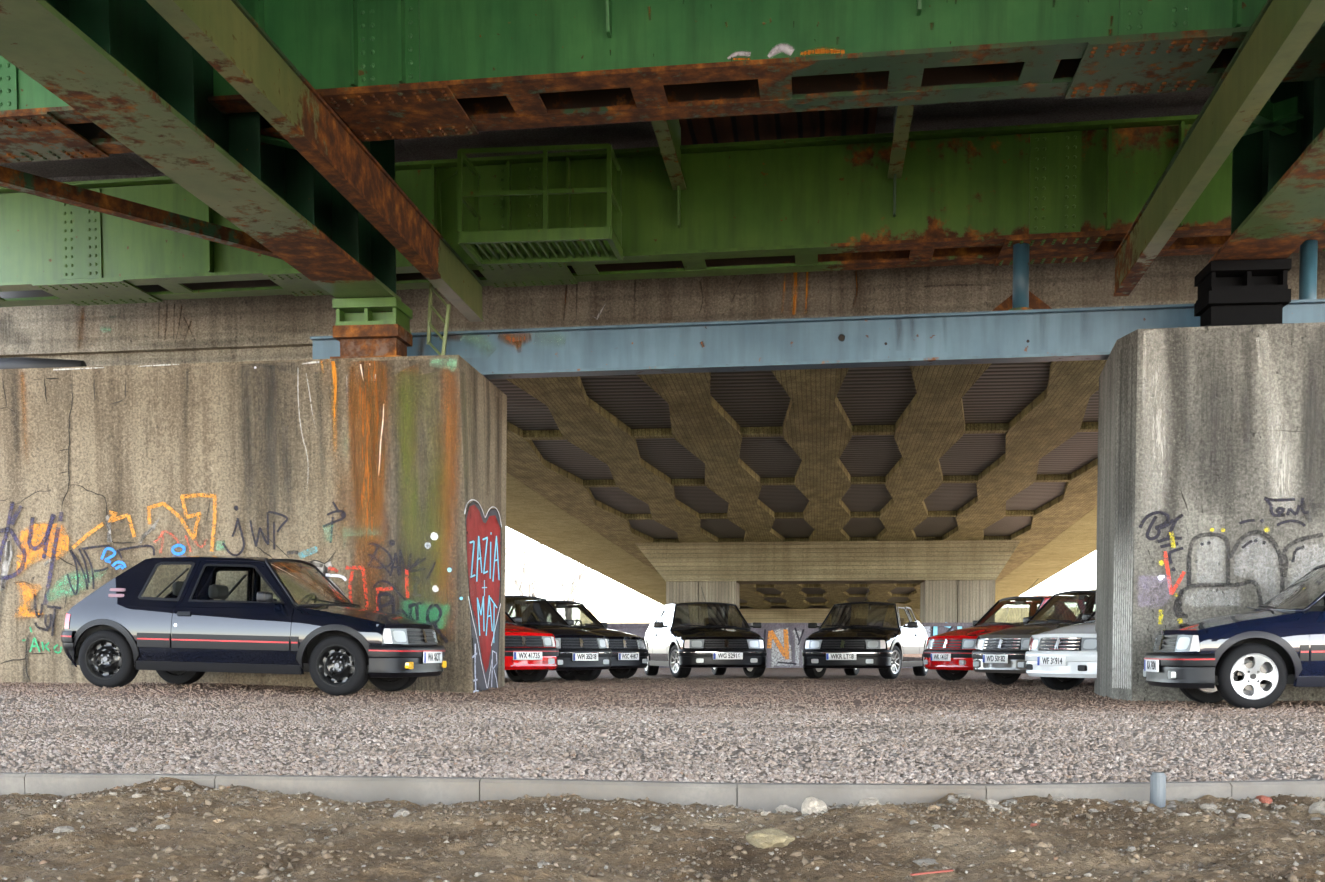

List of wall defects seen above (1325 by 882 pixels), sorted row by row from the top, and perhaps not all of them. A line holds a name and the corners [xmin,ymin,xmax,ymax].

corrosion [801,37,845,55]
corrosion [321,360,385,583]
damp [377,406,459,655]
damp [1201,342,1251,495]